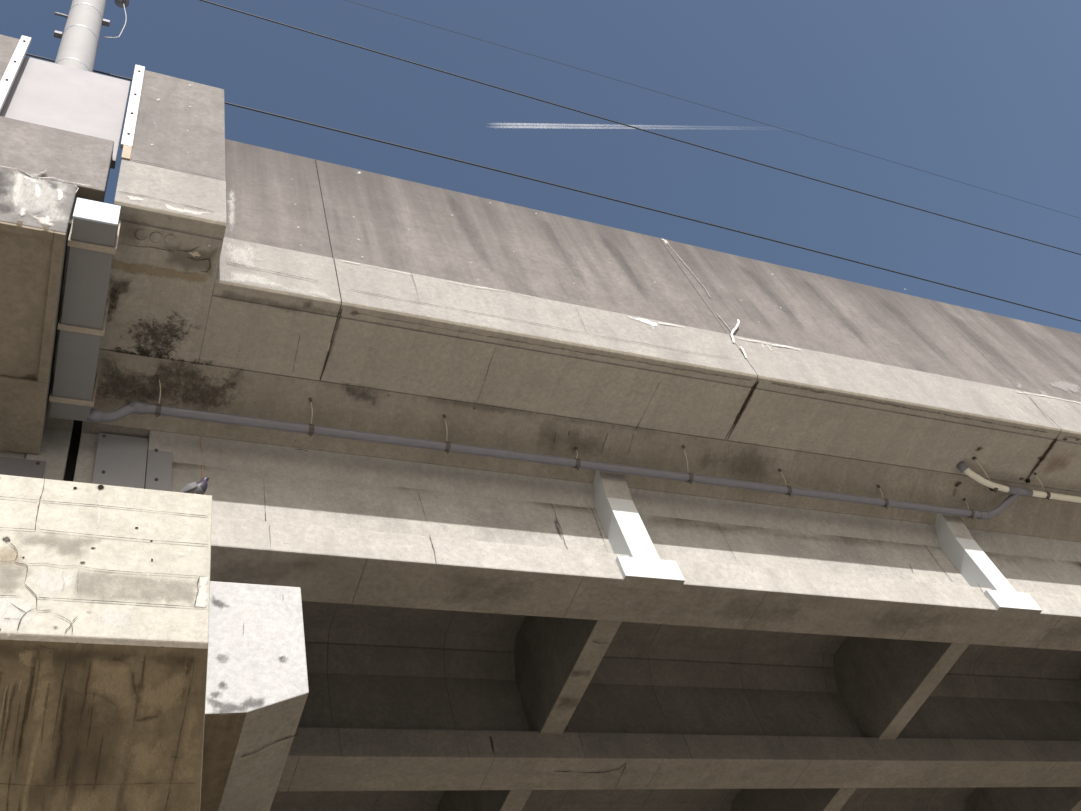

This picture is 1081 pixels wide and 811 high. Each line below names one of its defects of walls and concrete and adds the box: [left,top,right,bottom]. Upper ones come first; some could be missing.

leakage [102,316,235,406]
crack [4,542,193,649]
leakage [0,650,69,811]
leakage [93,661,184,710]